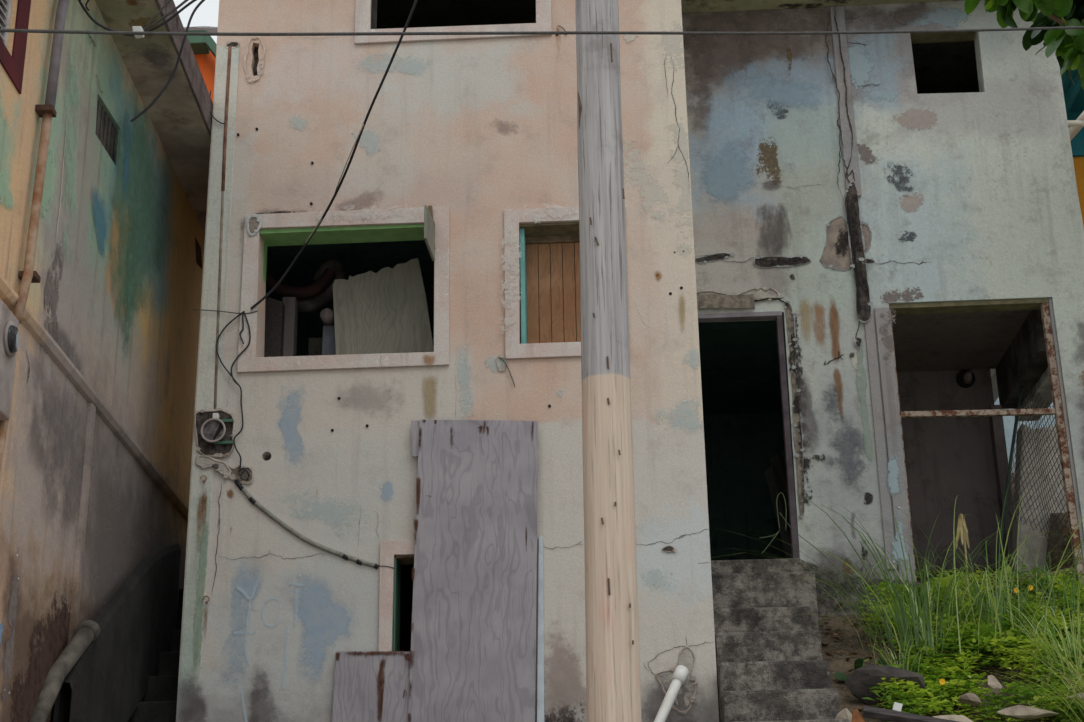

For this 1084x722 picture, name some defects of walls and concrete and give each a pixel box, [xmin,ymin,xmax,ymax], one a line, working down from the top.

peeling [670,118,735,264]
spalling [697,286,806,519]
rust [802,303,842,410]
spalling [753,181,924,364]
crack [765,6,934,365]